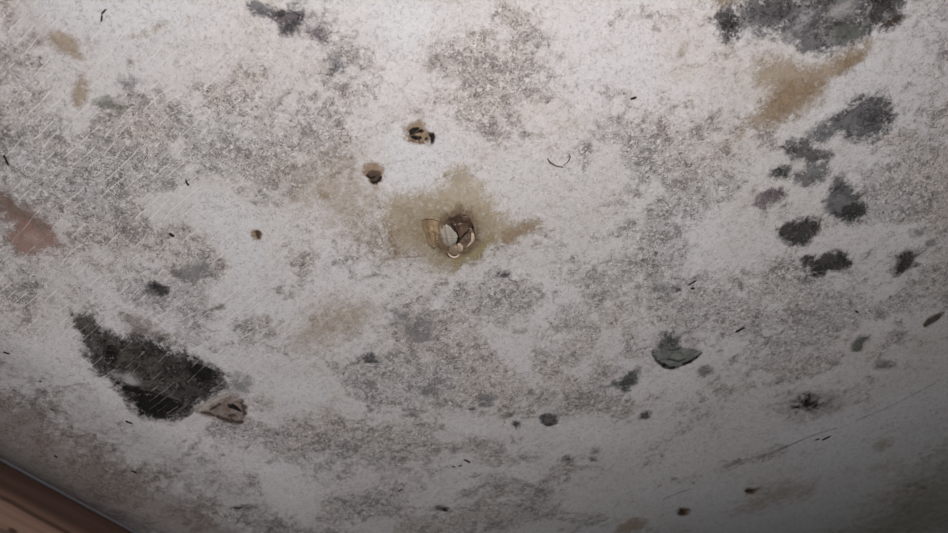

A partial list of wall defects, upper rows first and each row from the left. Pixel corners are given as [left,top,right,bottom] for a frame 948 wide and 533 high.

leakage [715,0,906,127]
mould [754,94,898,282]
peeling [652,331,702,369]
mould [794,394,824,411]